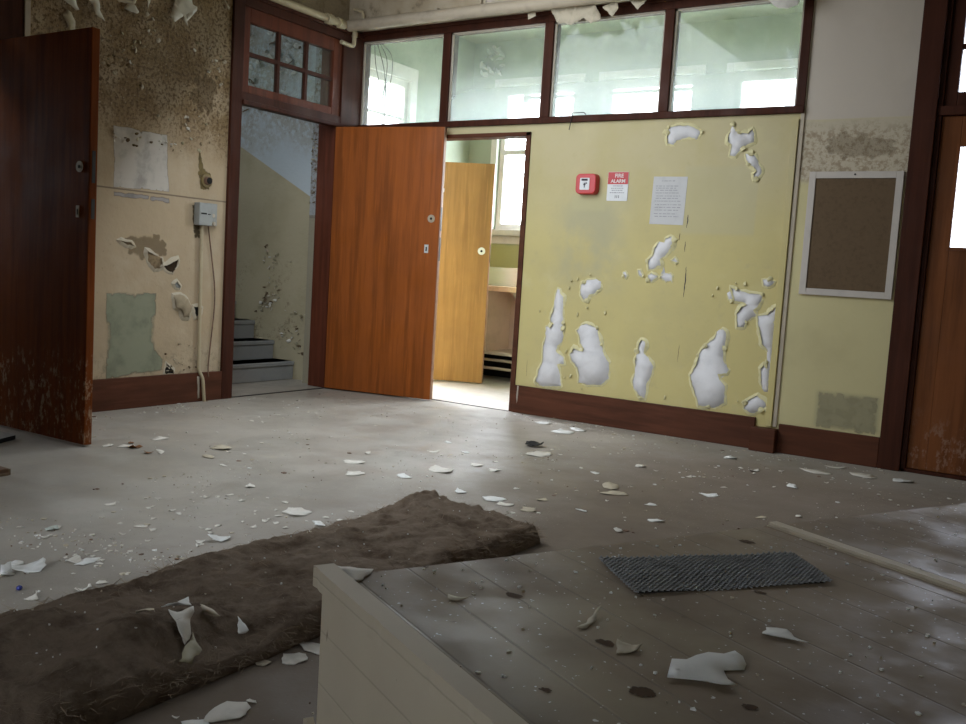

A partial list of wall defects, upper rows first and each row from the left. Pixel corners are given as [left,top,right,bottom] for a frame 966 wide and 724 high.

peeling [62,0,79,30]
peeling [99,0,161,81]
peeling [662,122,703,147]
peeling [725,122,765,182]
flaking render [116,237,203,321]
peeling [621,234,679,284]
flaking render [163,349,197,375]
peeling [533,274,611,390]
peeling [630,337,656,401]
peeling [688,276,777,416]